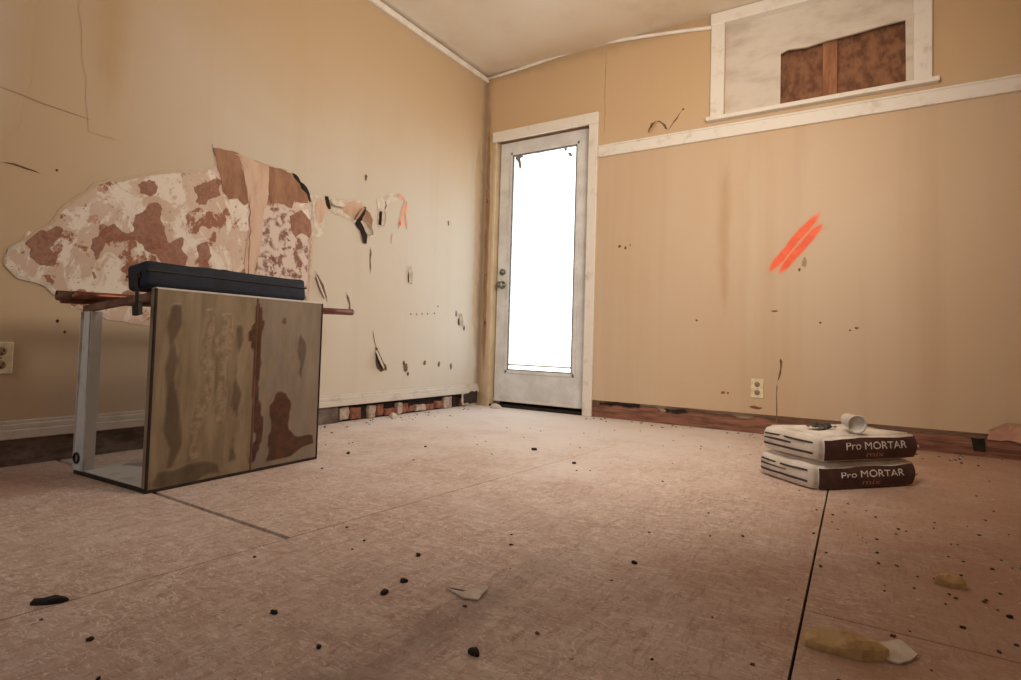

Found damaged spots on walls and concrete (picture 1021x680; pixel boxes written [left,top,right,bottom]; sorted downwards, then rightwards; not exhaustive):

flaking render [3,144,331,326]
peeling [343,201,373,244]
spalling [338,394,468,422]